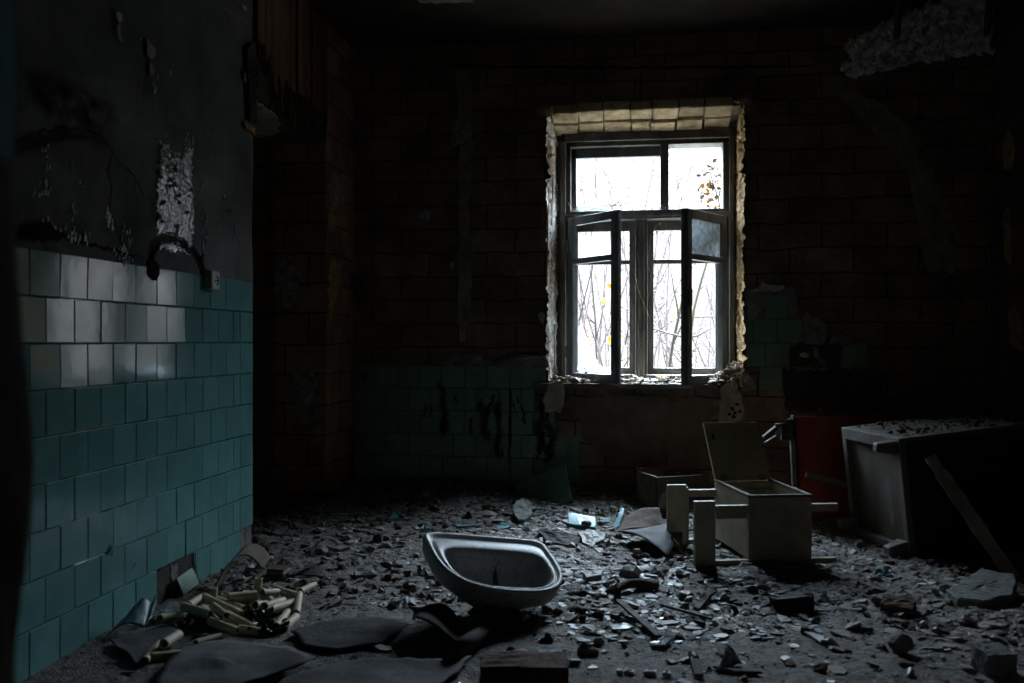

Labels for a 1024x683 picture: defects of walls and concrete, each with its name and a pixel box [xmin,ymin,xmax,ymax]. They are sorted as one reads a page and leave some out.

peeling [148,132,205,281]
damp [468,389,558,464]